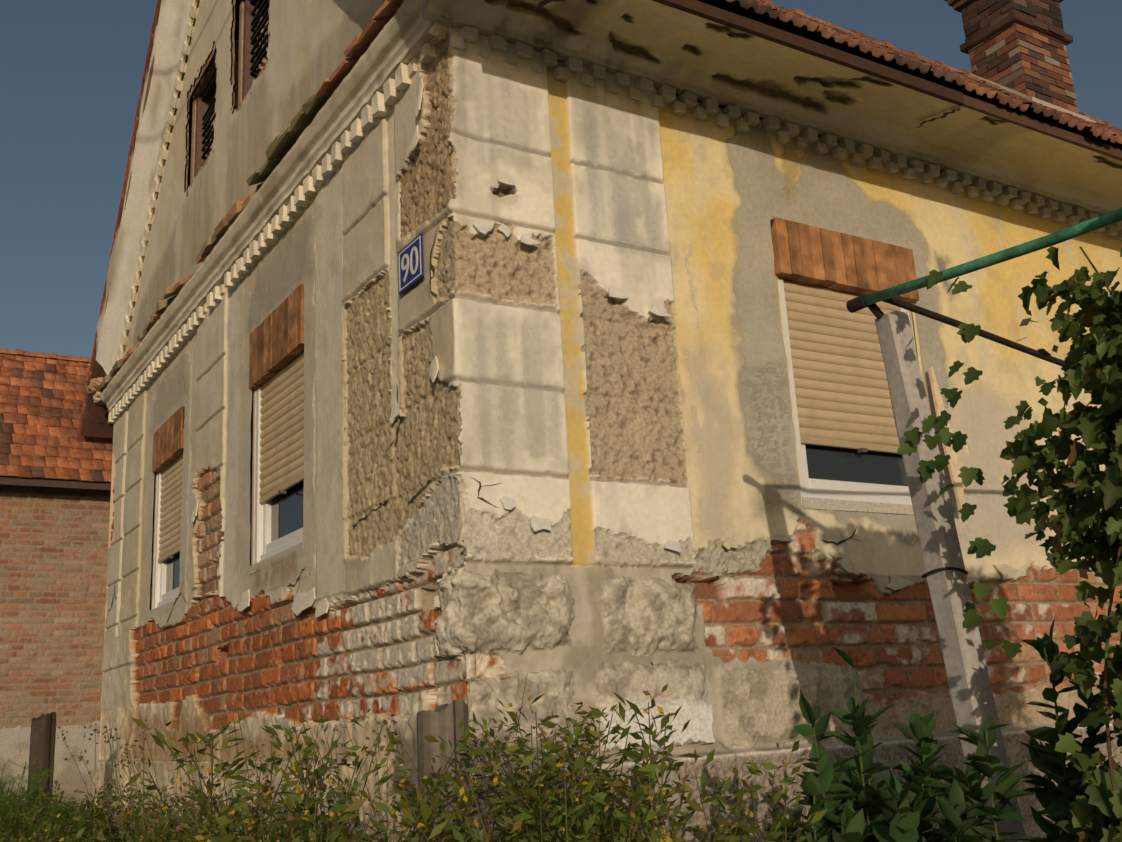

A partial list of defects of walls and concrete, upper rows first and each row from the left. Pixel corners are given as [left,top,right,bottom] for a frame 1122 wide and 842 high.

spalling [396,27,559,307]
flaking render [130,269,573,730]
spalling [578,269,688,487]
flaking render [594,518,958,736]
leakage [727,125,1042,543]
flaking render [967,562,1122,728]